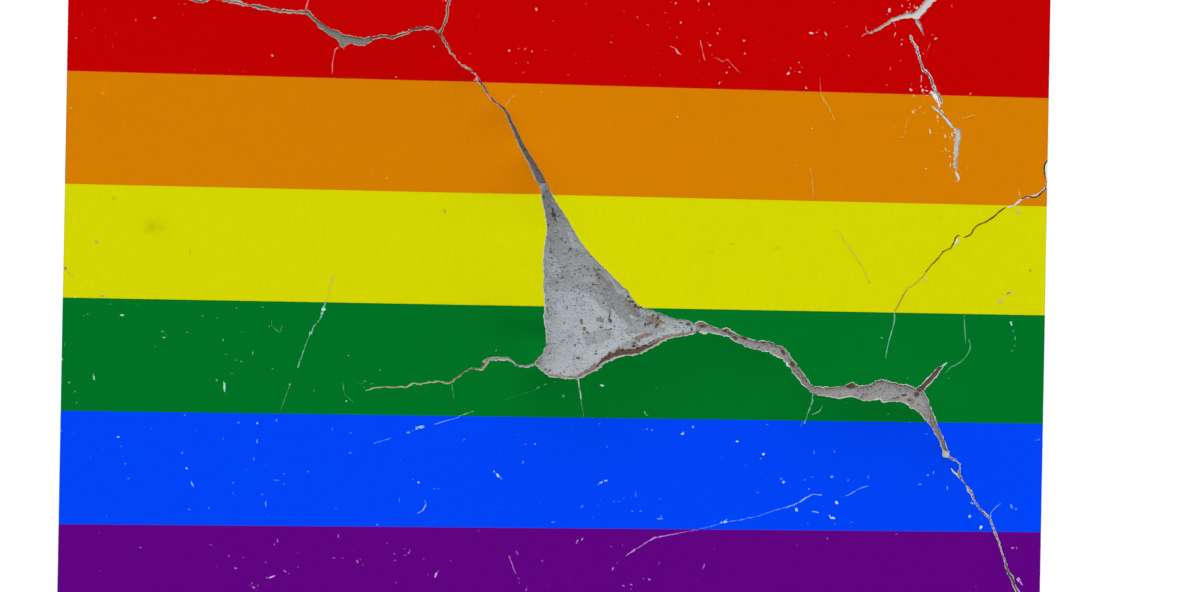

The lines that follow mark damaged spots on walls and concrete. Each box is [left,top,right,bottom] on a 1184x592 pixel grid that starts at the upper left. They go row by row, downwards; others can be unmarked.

crack [191,0,309,14]
crack [371,0,550,190]
crack [861,21,957,132]
crack [297,274,335,368]
crack [365,357,534,397]
spalling [534,183,713,387]
crack [694,321,816,425]
crack [918,318,971,390]
crack [886,161,1047,353]
crack [948,455,1020,592]